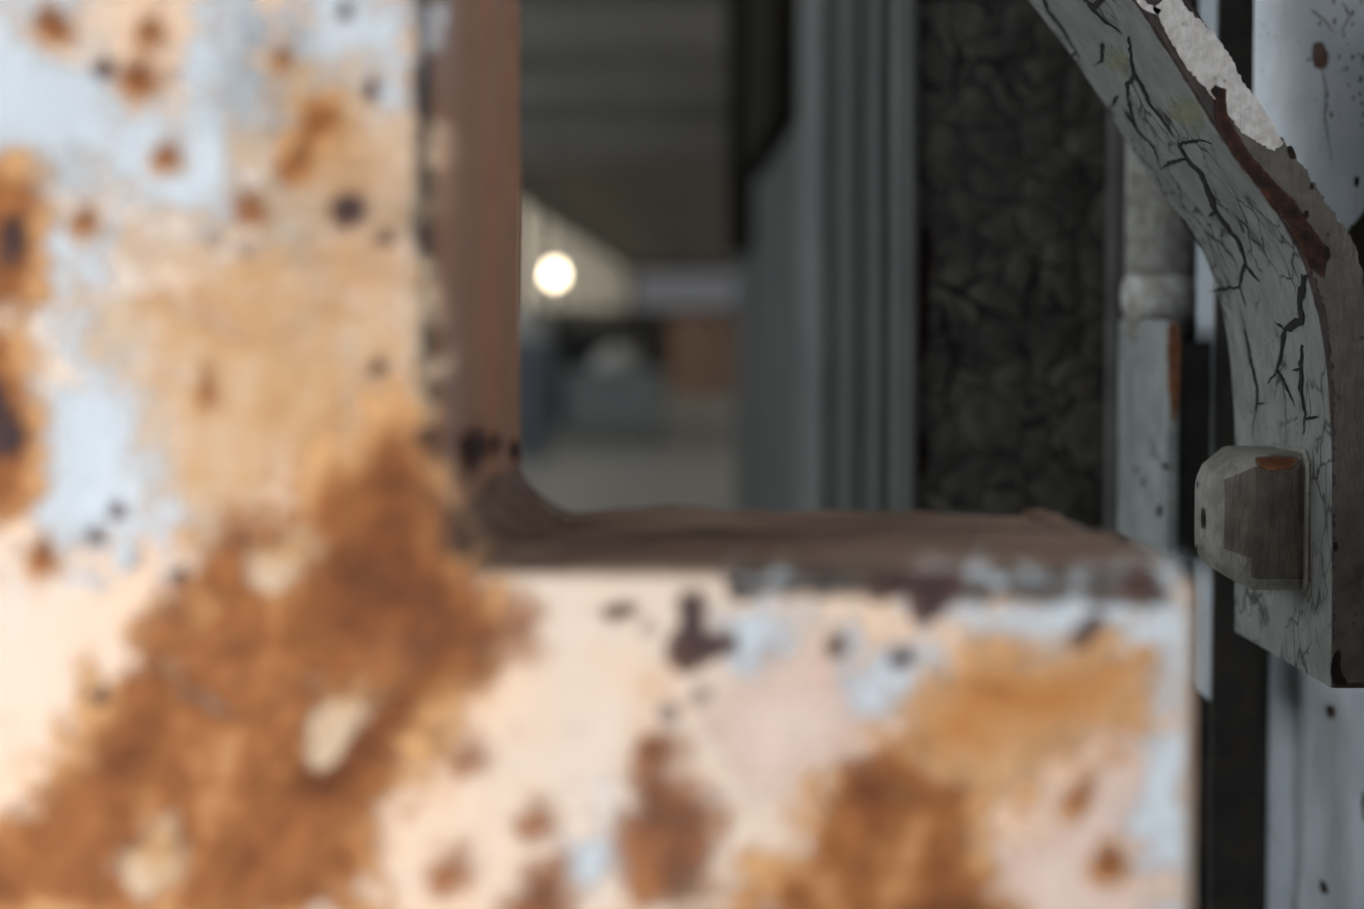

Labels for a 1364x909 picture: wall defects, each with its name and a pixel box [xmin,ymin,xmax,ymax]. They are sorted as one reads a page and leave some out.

corrosion [0,148,55,527]
corrosion [275,86,361,187]
crack [937,277,1027,324]
crack [1042,0,1319,438]
peeling [1136,0,1364,686]
corrosion [1215,85,1326,278]
crack [1322,70,1334,170]
corrosion [0,371,539,909]
corrosion [615,735,730,909]
corrosion [729,626,1157,909]
peeling [825,566,1186,876]
peeling [1325,704,1335,718]